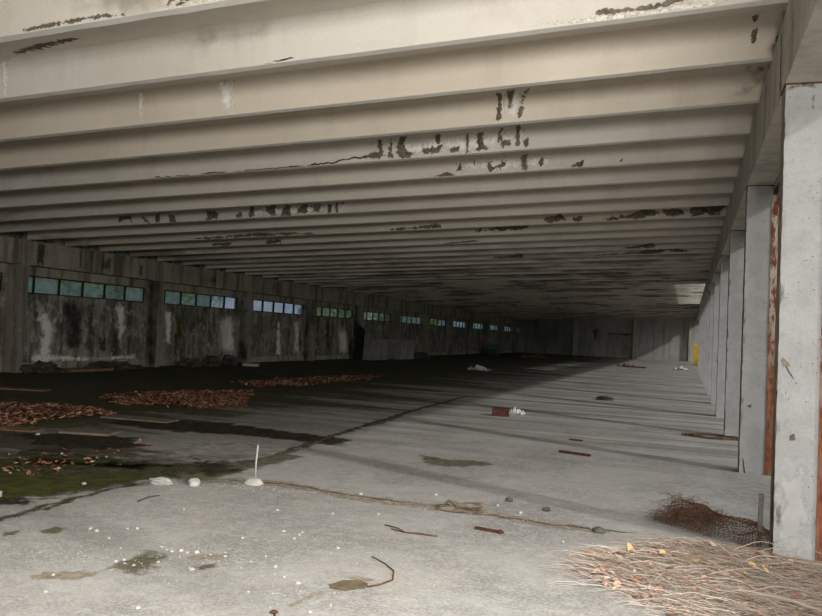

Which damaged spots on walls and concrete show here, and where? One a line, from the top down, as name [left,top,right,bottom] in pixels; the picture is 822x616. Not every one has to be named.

spalling [167,0,222,9]
spalling [543,0,728,24]
peeling [13,38,80,55]
damp [32,304,135,362]
damp [220,317,248,359]
crack [0,482,145,521]